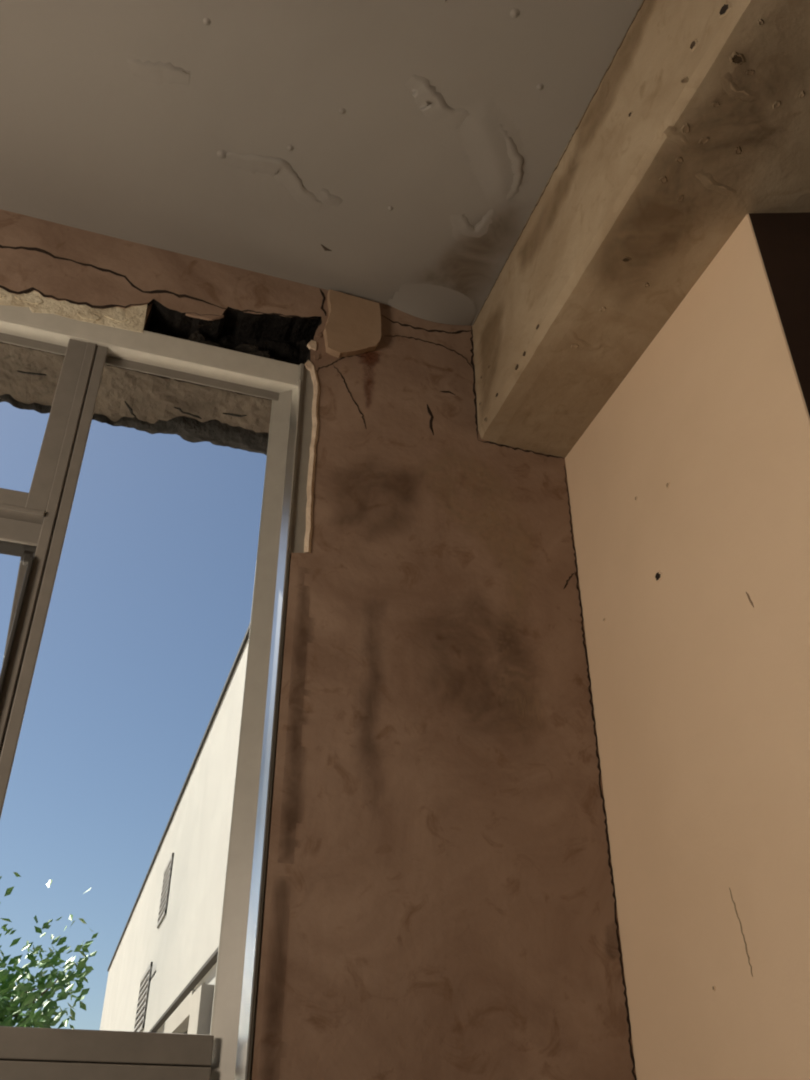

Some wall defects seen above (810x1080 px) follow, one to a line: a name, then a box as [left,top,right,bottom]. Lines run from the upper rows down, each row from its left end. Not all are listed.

crack [0,245,326,319]
flaking render [0,285,322,553]
crack [321,355,366,428]
crack [382,0,645,1080]
crack [729,888,753,977]